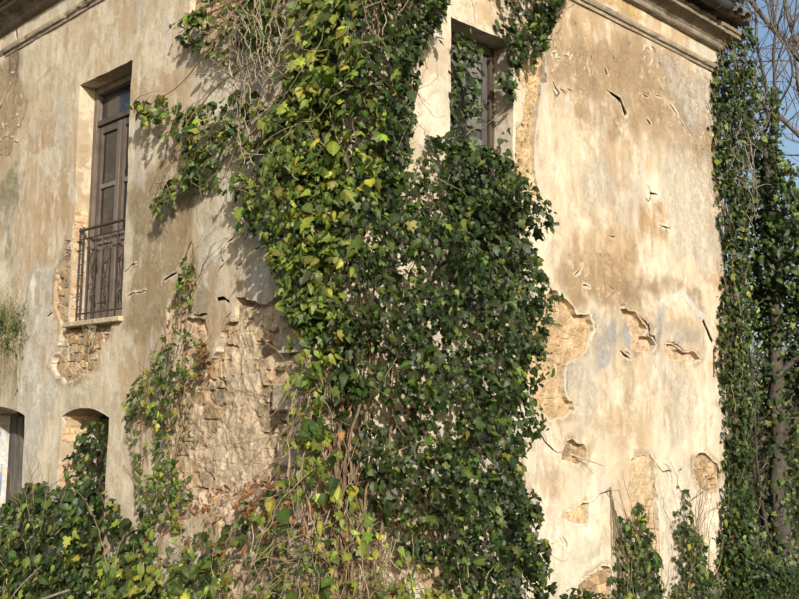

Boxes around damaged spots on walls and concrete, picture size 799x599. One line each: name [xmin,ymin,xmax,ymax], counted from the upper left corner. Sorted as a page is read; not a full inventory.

flaking render [195,0,248,35]
flaking render [69,210,88,322]
flaking render [528,248,651,420]
spalling [561,441,584,463]
flaking render [693,453,720,493]
flaking render [564,500,590,524]
flaking render [628,454,659,587]